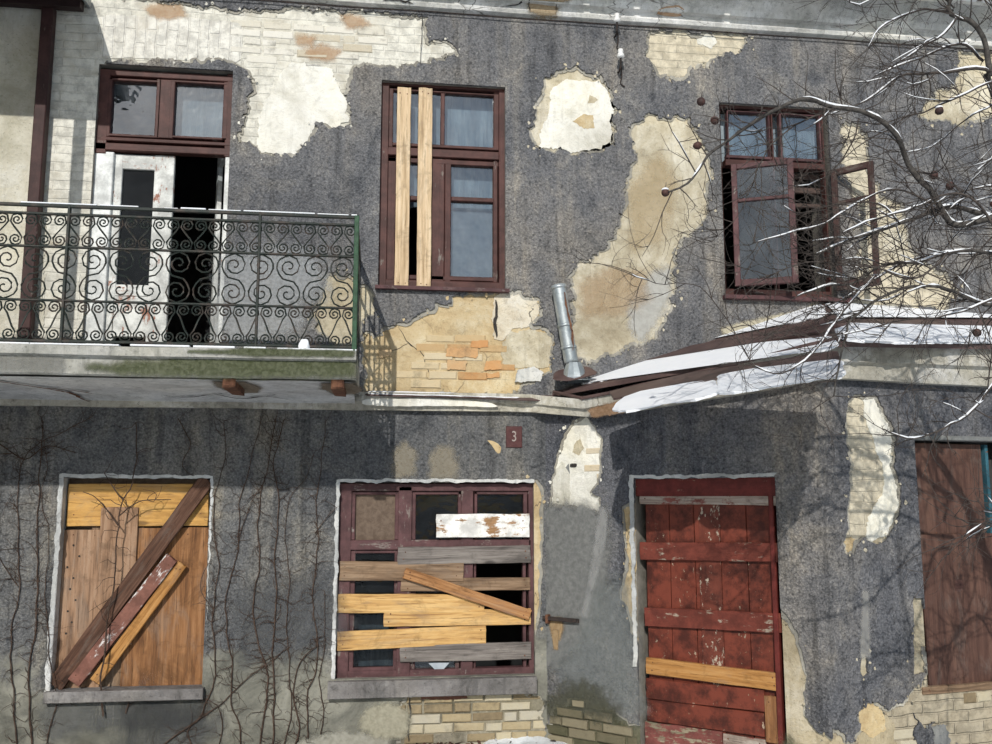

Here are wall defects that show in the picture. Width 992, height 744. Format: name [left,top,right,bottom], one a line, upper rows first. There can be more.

flaking render [529,0,570,19]
flaking render [657,5,684,17]
flaking render [645,29,754,83]
flaking render [0,7,41,342]
flaking render [33,0,460,343]
flaking render [527,62,718,365]
flaking render [308,268,555,408]
flaking render [523,417,604,648]
flaking render [841,390,908,556]
flaking render [298,694,641,744]
flaking render [781,592,992,744]